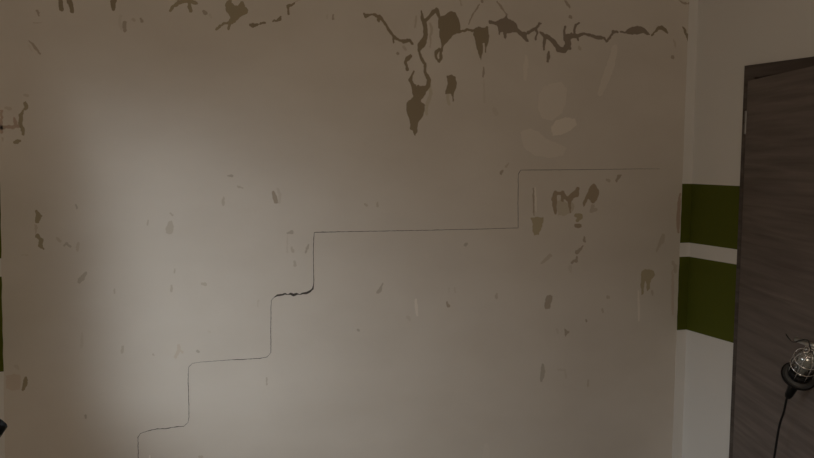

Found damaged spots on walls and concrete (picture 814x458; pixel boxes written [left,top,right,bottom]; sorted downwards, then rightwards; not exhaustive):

peeling [215,0,248,31]
peeling [363,7,668,135]
crack [271,231,374,304]
crack [137,326,271,458]